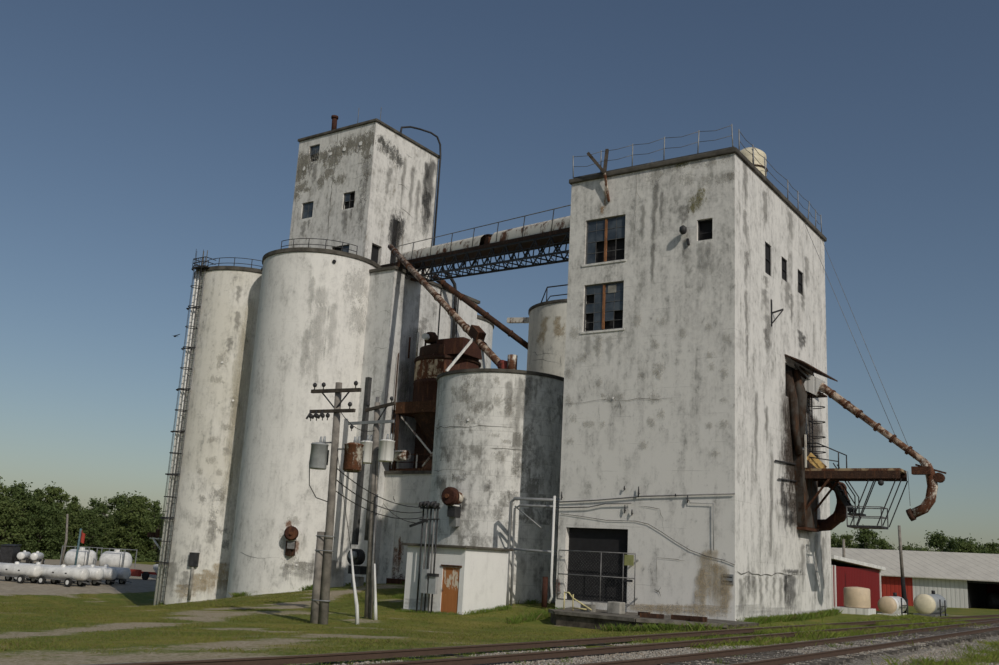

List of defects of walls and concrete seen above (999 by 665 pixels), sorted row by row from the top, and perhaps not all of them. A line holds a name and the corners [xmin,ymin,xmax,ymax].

water stain [422,162,435,222]
water stain [389,215,404,248]
water stain [781,381,821,527]